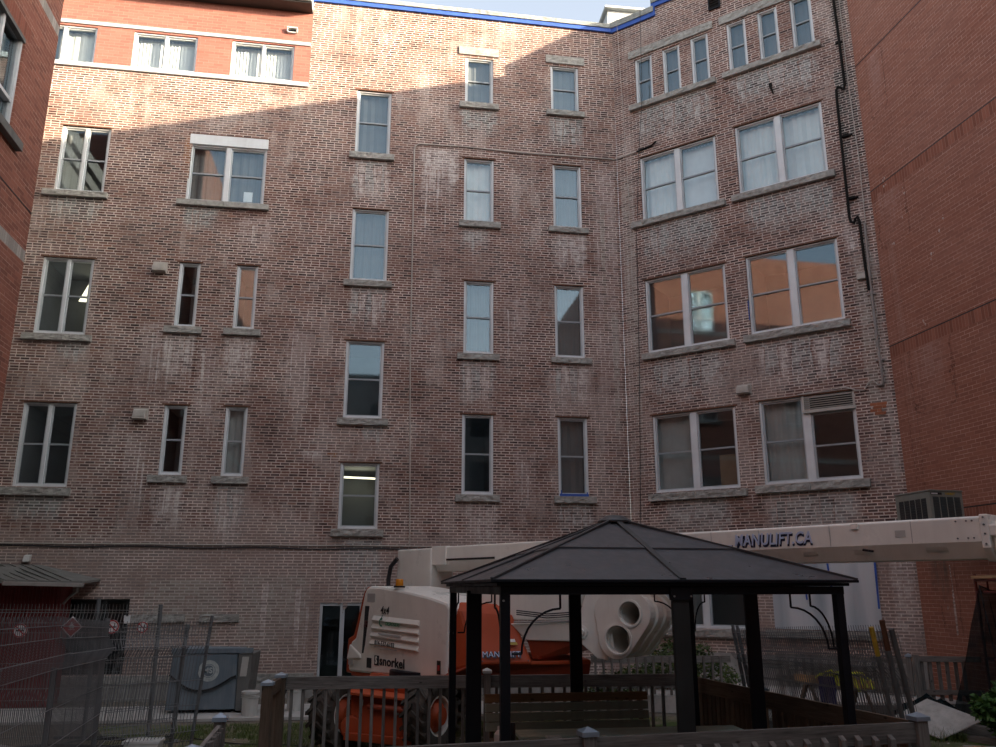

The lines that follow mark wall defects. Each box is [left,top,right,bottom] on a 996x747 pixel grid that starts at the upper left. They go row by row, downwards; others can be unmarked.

water stain [349,158,394,208]
water stain [417,147,462,245]
water stain [630,0,910,528]